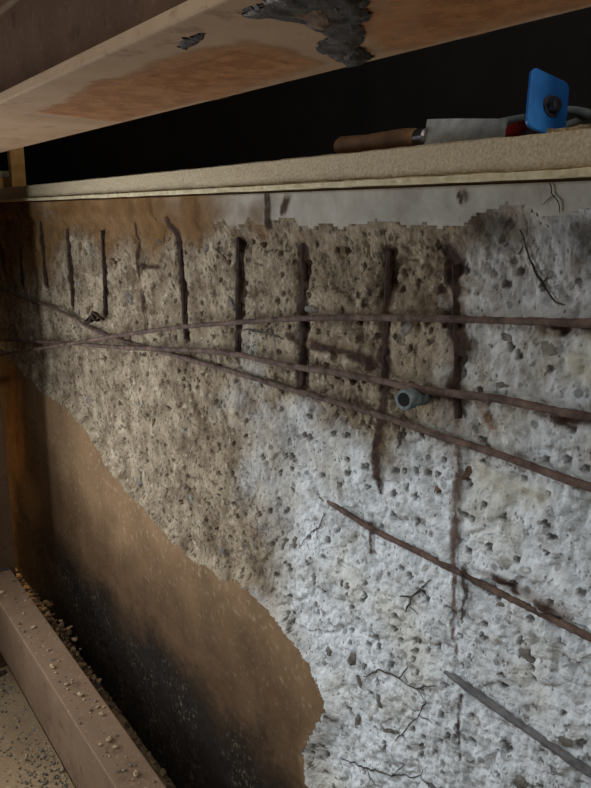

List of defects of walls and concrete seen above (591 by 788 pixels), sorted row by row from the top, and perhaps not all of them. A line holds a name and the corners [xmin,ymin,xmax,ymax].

peeling [237,0,375,68]
crack [517,227,565,305]
rust [284,290,390,494]
rust [437,309,471,413]
rust [549,409,591,425]
spalling [0,202,591,788]
rust [449,445,469,654]
rust [492,574,520,595]
damp [14,491,287,788]
crack [363,667,436,742]
rust [455,693,463,761]
crack [340,758,429,786]